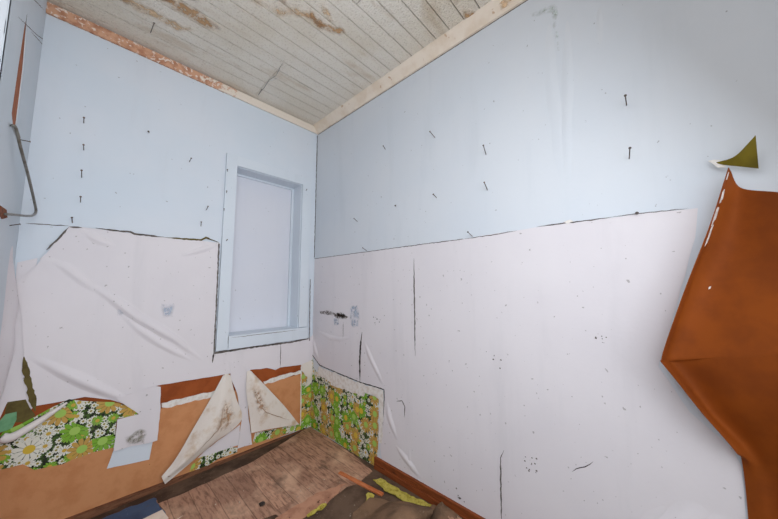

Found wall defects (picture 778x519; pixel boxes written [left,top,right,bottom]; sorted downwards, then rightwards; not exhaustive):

damp [166,0,216,27]
damp [295,9,343,33]
crack [314,0,528,259]
crack [538,209,680,227]
crack [410,273,418,341]
peeling [264,370,302,384]
peeling [161,391,215,408]
crack [498,451,506,519]